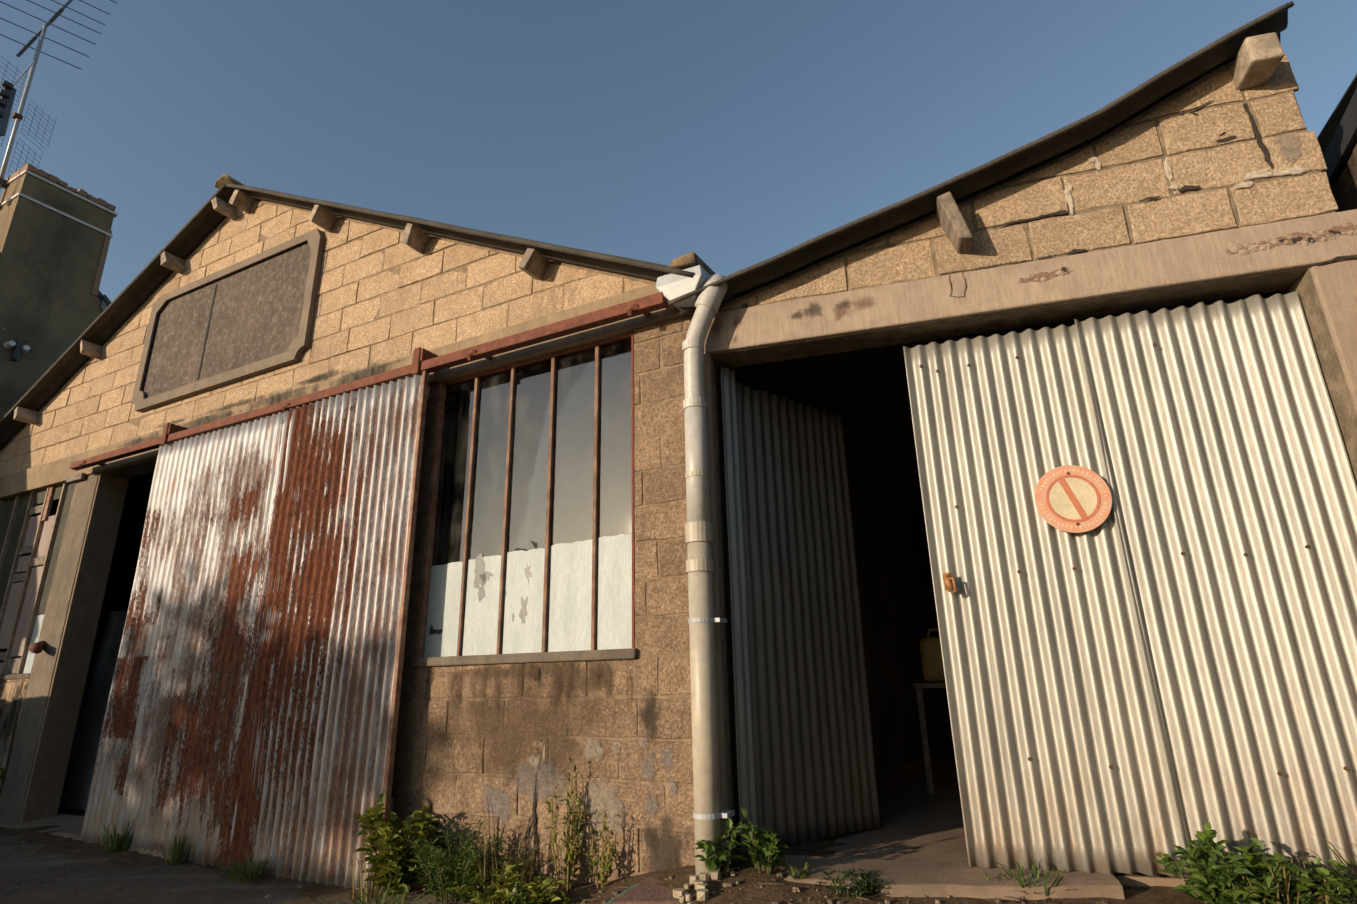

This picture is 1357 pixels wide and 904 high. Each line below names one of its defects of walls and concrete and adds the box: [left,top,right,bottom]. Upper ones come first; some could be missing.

spalling [1227,222,1357,255]
spalling [1019,267,1073,283]
leakage [792,304,820,318]
peeling [474,553,493,602]
peeling [504,564,532,624]
rust [93,382,421,887]